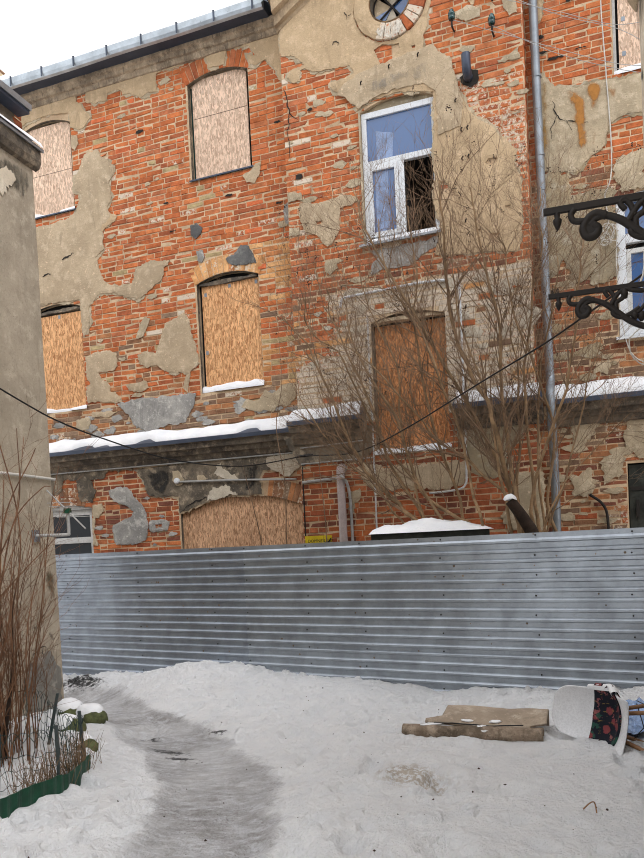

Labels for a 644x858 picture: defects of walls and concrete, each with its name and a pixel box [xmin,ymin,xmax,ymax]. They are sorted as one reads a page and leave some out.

crack [283,89,298,157]
crack [550,101,575,139]
rust [570,83,600,147]
peeling [0,166,16,196]
leakage [0,160,24,196]
flaking render [35,194,79,227]
flaking render [70,0,644,543]
flaking render [54,468,181,553]